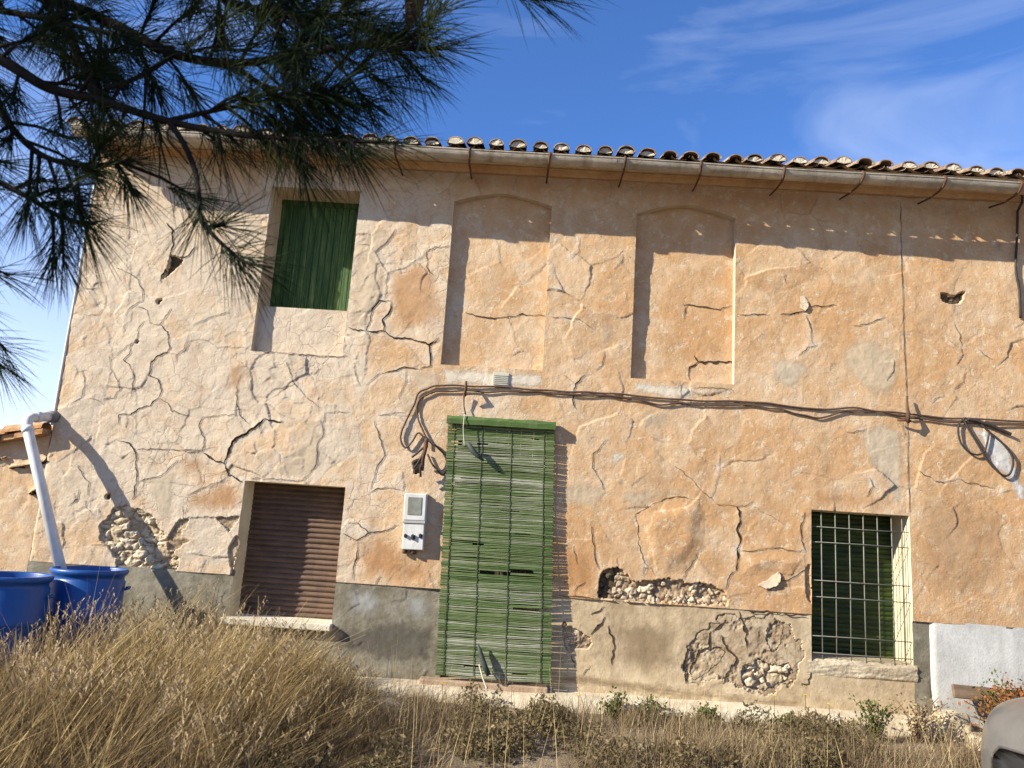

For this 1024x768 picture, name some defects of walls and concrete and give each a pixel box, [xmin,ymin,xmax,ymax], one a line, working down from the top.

spalling [165,257,183,278]
crack [467,289,593,329]
spalling [941,293,962,304]
crack [71,222,447,518]
spalling [100,494,189,571]
crack [343,522,396,584]
crack [635,454,805,684]
spalling [597,567,805,696]